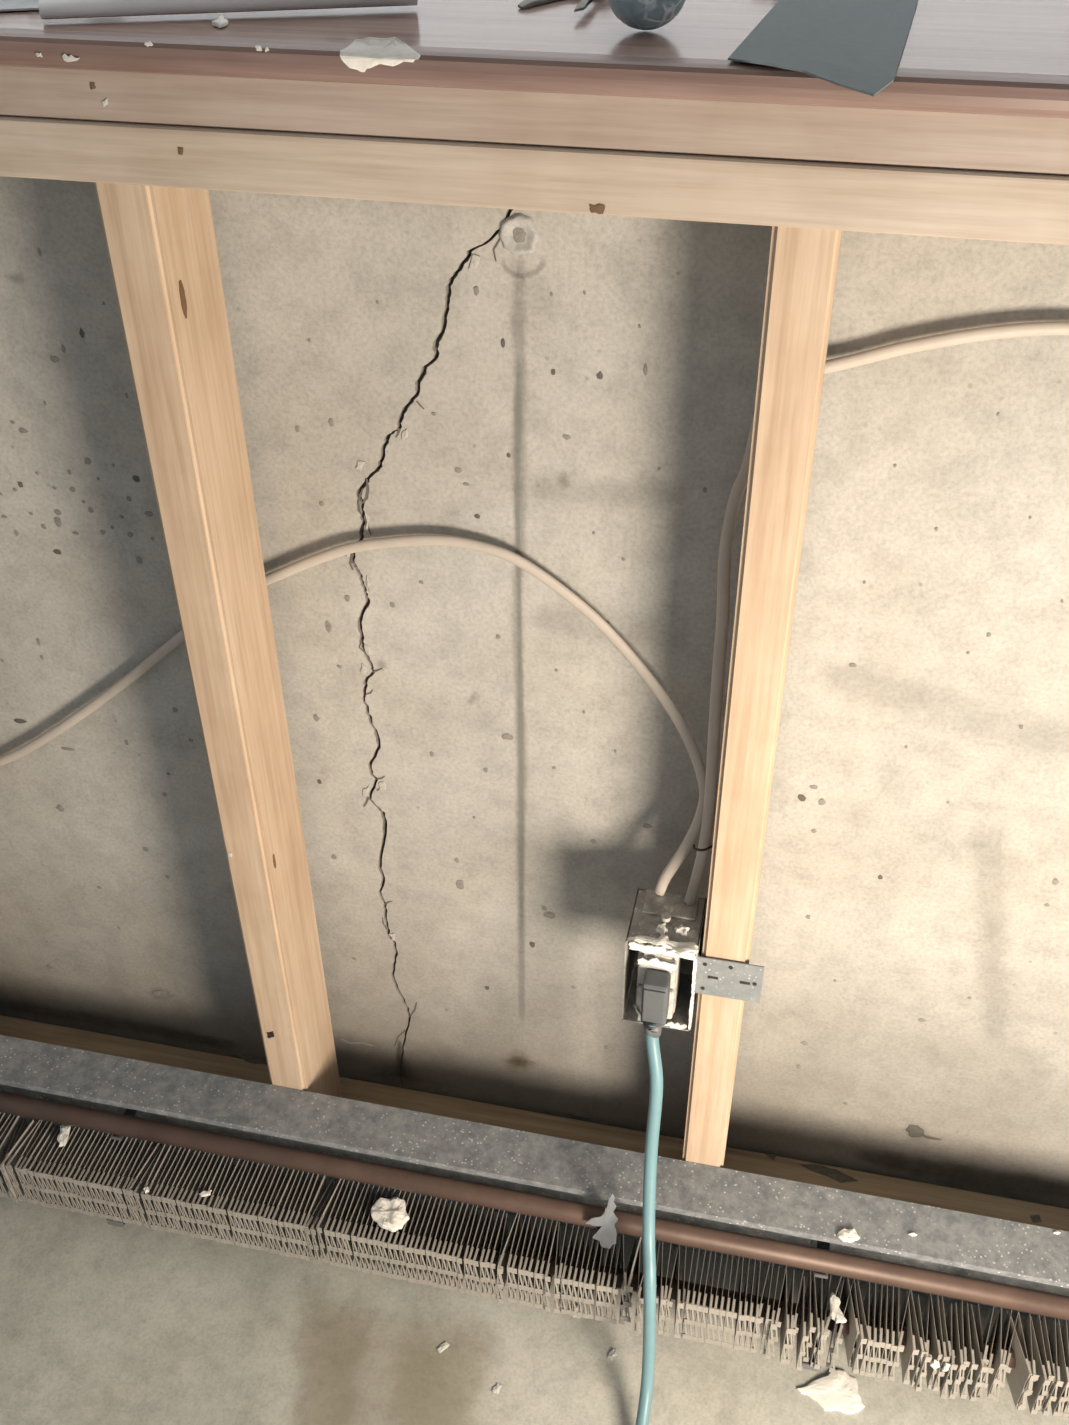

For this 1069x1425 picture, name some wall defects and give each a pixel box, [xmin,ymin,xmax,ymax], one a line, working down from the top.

crack [346,209,513,1088]